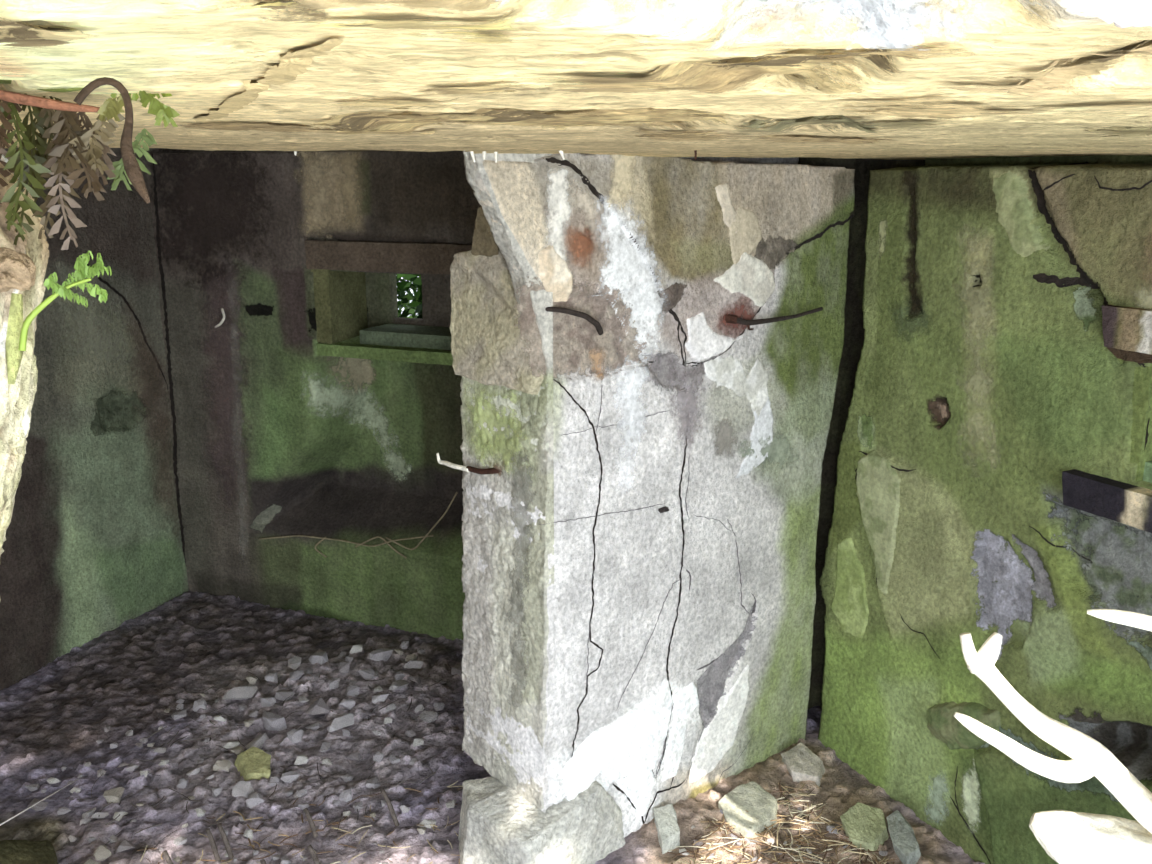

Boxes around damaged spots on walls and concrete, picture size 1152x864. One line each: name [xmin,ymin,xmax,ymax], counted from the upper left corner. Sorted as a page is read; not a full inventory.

crack [81,154,186,564]
crack [543,157,604,204]
rust [565,230,594,267]
spalling [515,244,773,478]
rust [718,299,755,335]
crack [624,215,854,388]
peeling [714,183,798,307]
crack [1028,162,1152,305]
crack [539,379,756,824]
spalling [971,529,1056,659]
spalling [1044,492,1152,670]
peeling [561,606,757,817]